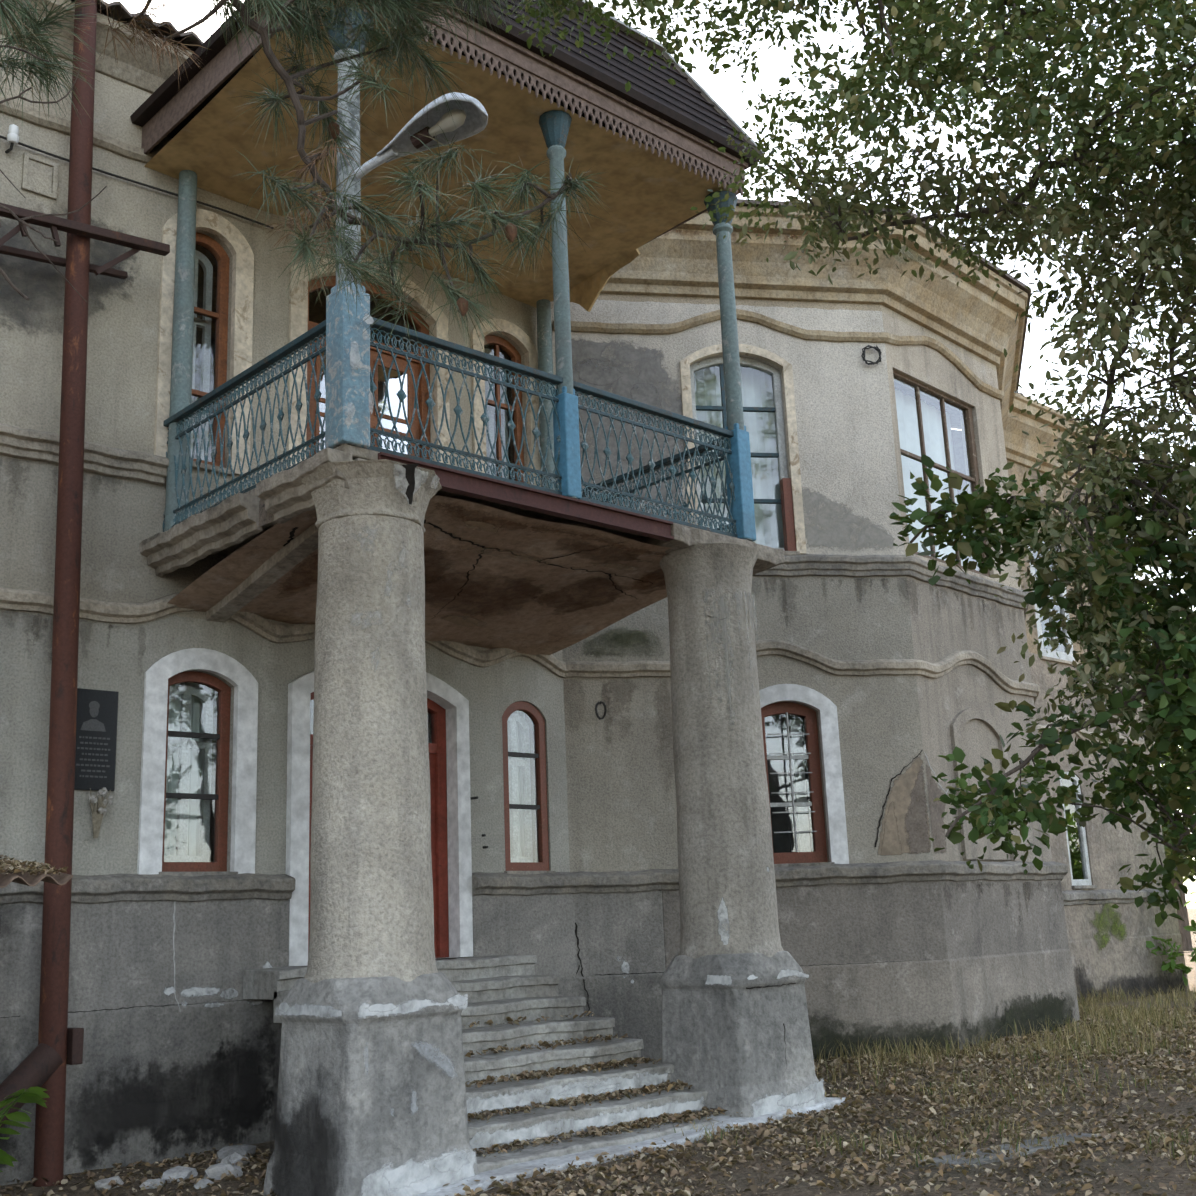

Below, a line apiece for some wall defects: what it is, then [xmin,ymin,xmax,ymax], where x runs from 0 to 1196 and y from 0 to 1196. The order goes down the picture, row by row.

crack [424,520,653,619]
peeling [875,750,949,855]
crack [575,923,664,1016]
water stain [809,965,1186,1062]
water stain [74,1024,335,1196]